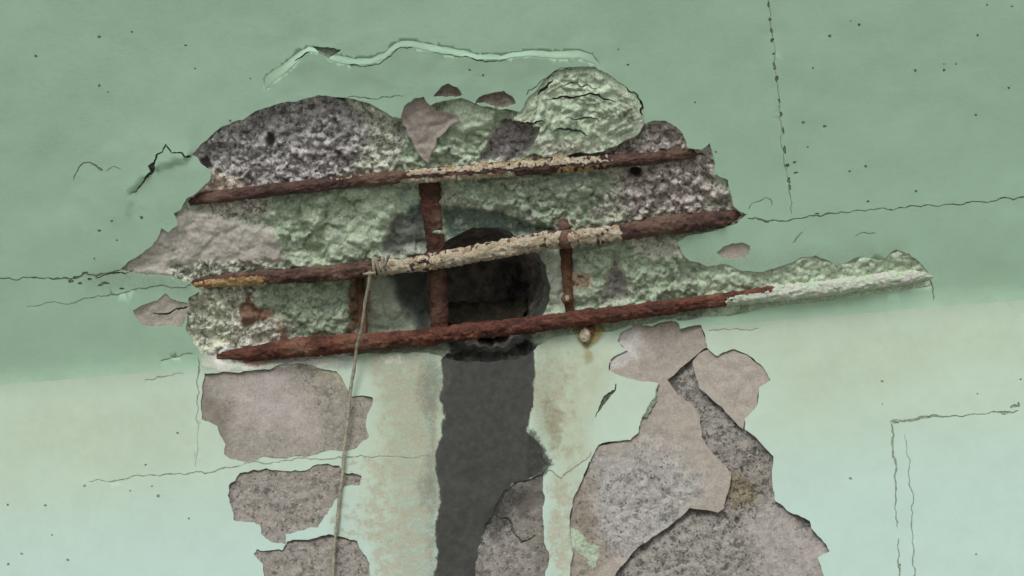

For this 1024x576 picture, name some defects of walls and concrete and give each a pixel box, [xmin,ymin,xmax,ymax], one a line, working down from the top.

peeling [265,41,599,89]
crack [748,0,1024,243]
crack [74,144,191,193]
crack [0,269,191,307]
corrosion [240,288,288,335]
spalling [121,84,933,576]
corrosion [573,323,604,346]
efflorescence [201,357,347,373]
water stain [434,340,552,576]
crack [890,402,1020,576]